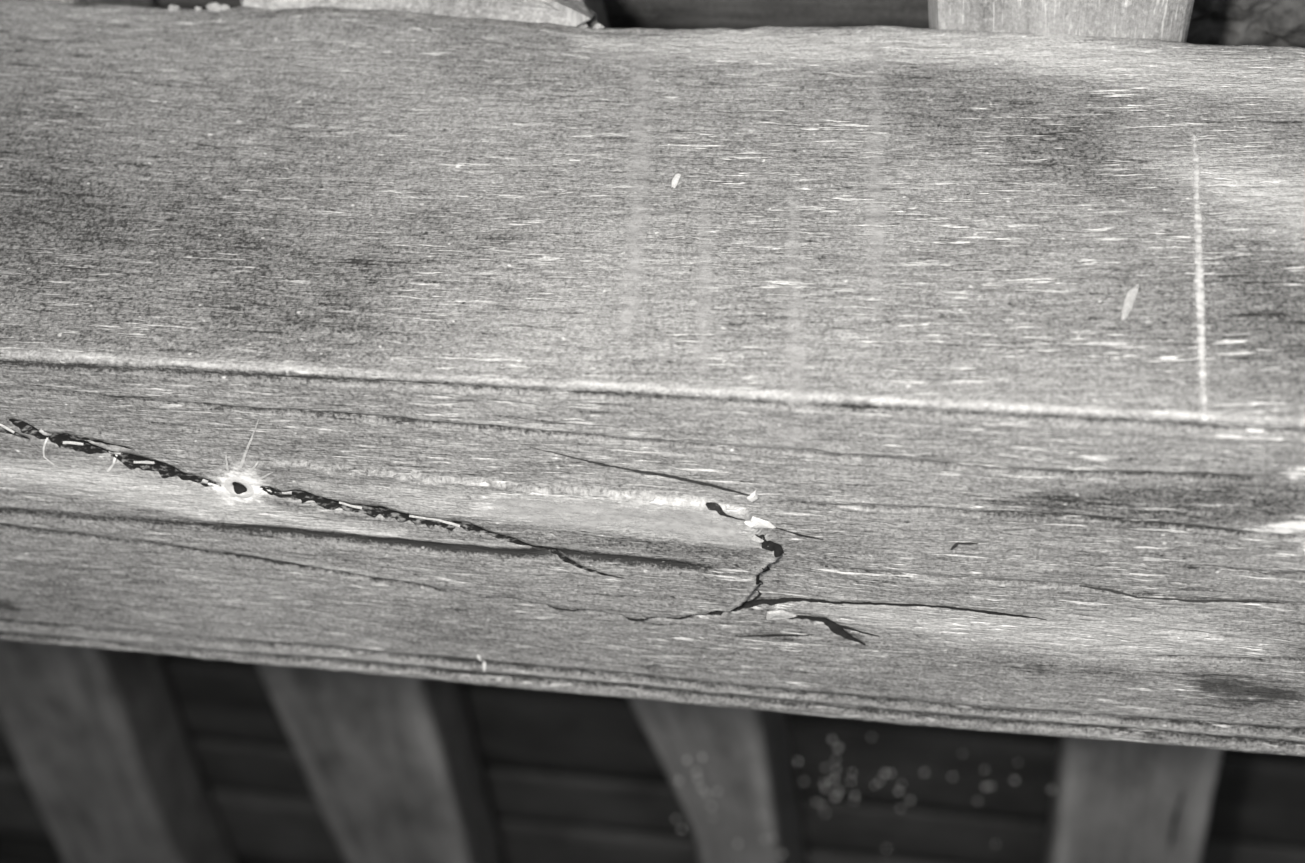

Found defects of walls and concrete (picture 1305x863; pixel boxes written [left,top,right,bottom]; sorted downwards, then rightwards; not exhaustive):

crack [0,419,221,487]
crack [530,447,750,496]
crack [260,486,624,579]
crack [486,597,1046,646]